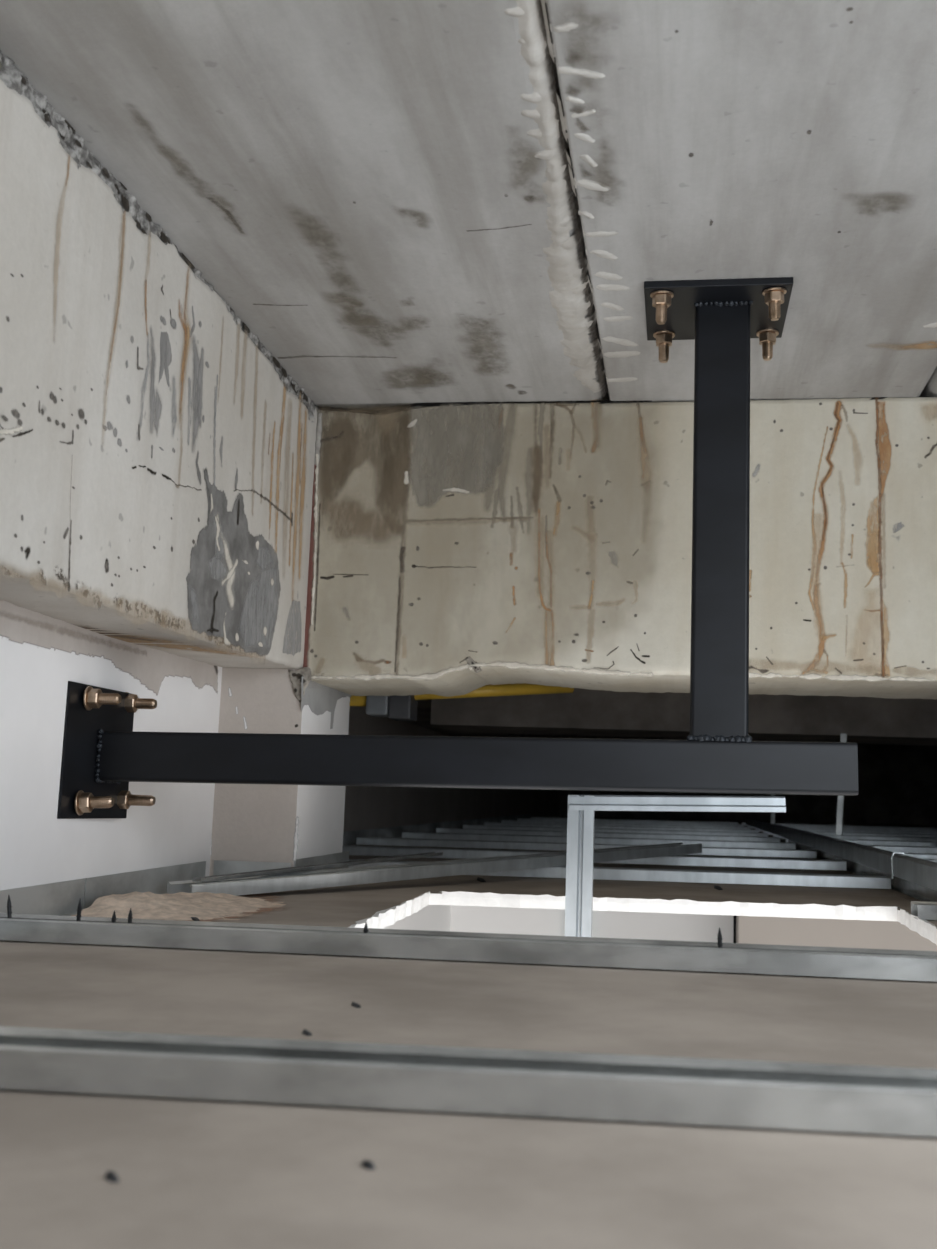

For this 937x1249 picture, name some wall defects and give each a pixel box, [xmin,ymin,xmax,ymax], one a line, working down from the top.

water stain [569,88,588,130]
spalling [0,49,319,423]
peeling [0,303,351,729]
rust [180,277,190,411]
rust [268,387,323,668]
water stain [320,407,409,538]
water stain [485,384,545,529]
rust [533,421,561,666]
rust [802,401,843,674]